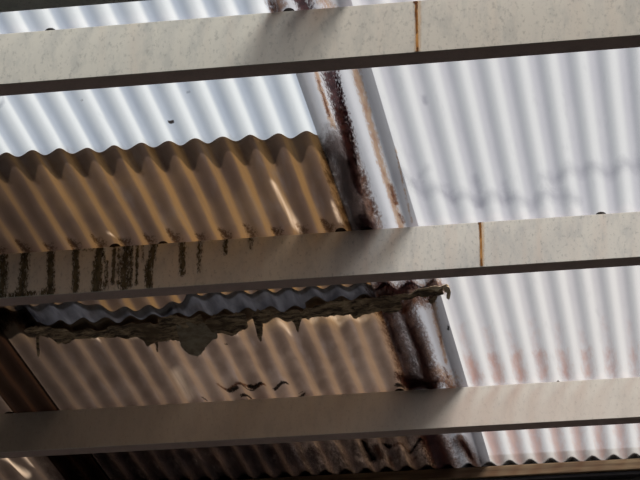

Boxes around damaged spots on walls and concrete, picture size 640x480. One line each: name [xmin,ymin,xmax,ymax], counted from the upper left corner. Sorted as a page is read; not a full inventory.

corrosion [268,0,286,12]
corrosion [294,0,314,10]
corrosion [316,70,381,231]
damp [0,240,55,298]
damp [67,234,158,293]
damp [166,228,186,276]
corrosion [24,279,456,391]
corrosion [416,434,481,469]